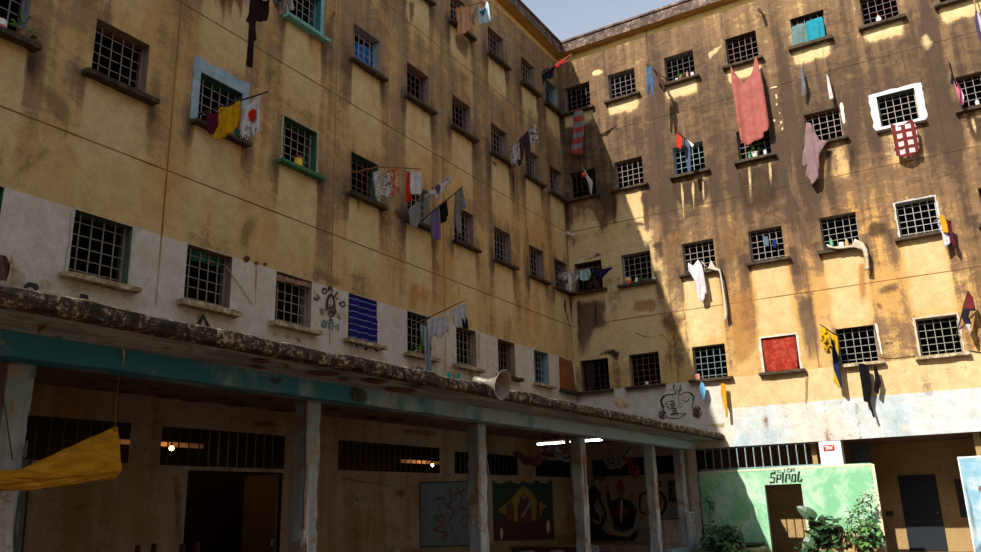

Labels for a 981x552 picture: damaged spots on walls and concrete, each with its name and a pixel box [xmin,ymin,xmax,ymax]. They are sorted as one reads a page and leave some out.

leakage [965,116,981,140]
leakage [641,192,649,226]
leakage [674,179,709,212]
leakage [798,296,817,354]